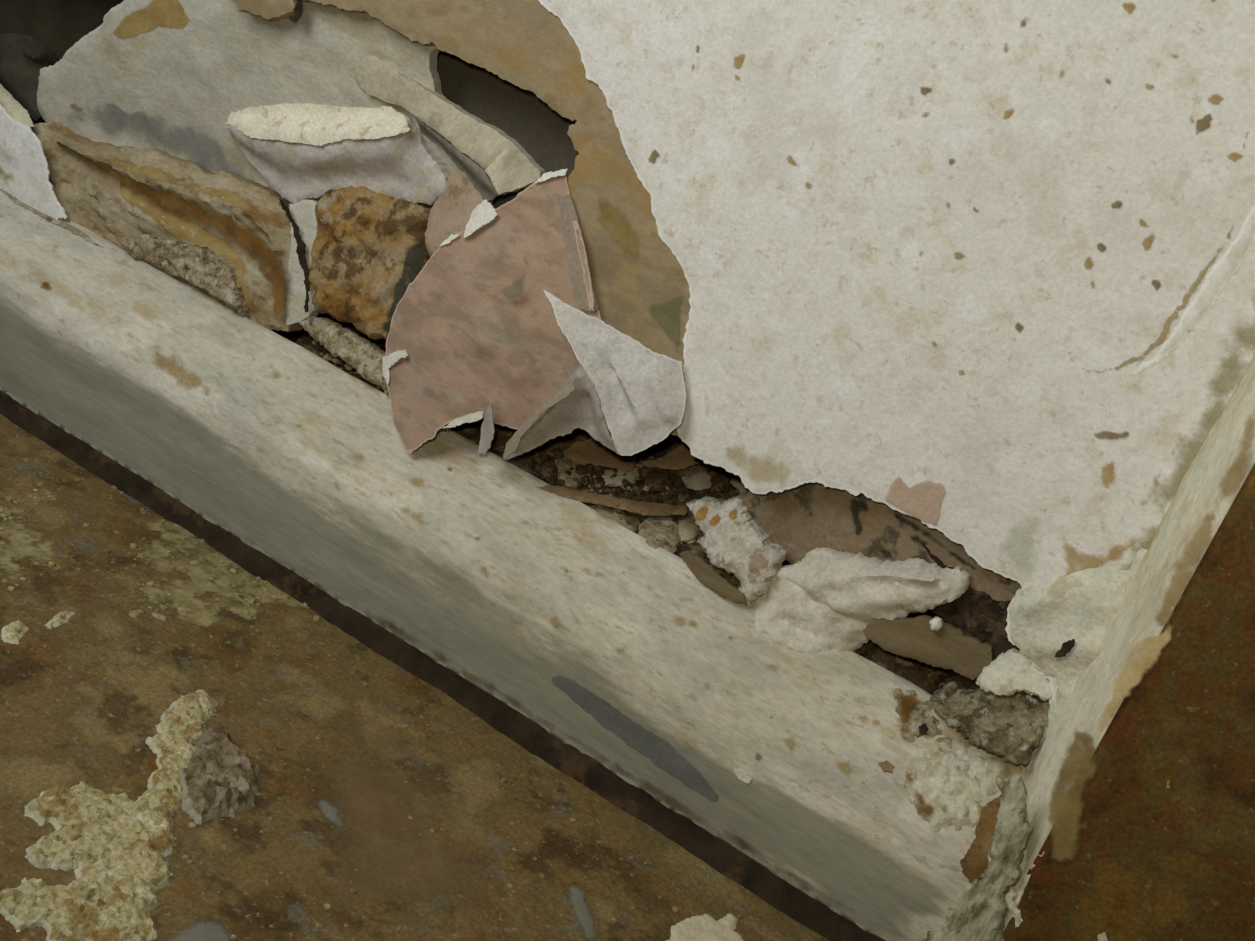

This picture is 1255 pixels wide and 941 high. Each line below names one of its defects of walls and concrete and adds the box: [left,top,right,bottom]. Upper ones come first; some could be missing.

spalling [0,0,124,62]
flaking render [0,188,103,247]
spalling [273,326,310,343]
crack [1097,231,1231,372]
water stain [1164,327,1255,497]
peeling [1220,417,1254,498]
peeling [680,550,747,605]
peeling [886,477,945,524]
water stain [1137,528,1156,551]
peeling [1049,513,1215,862]
peeling [552,676,719,801]
flaking render [879,648,1053,941]